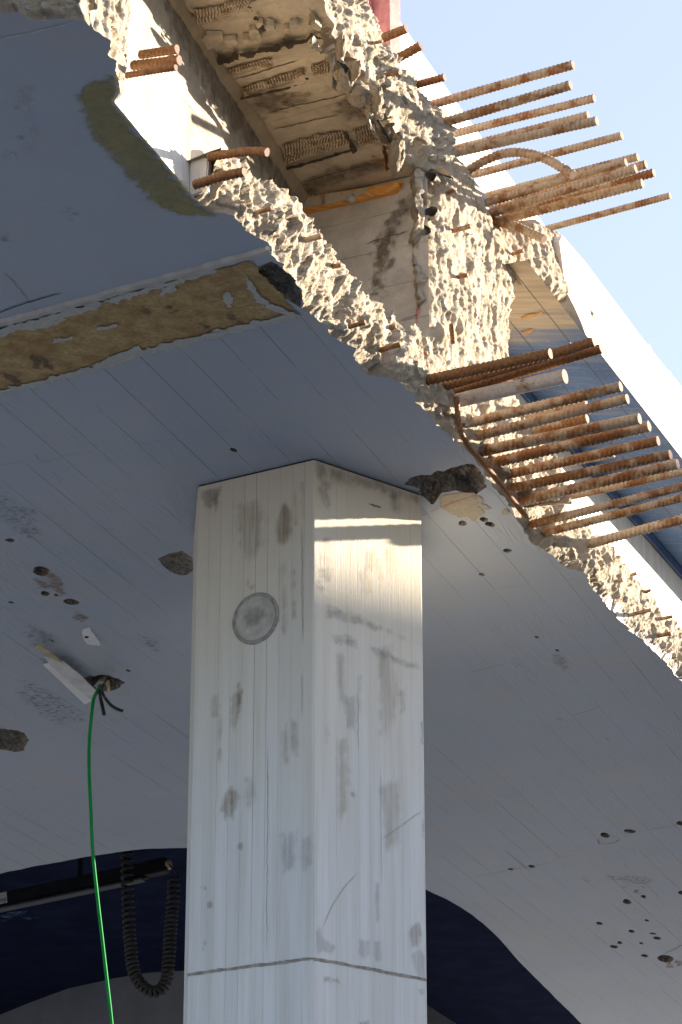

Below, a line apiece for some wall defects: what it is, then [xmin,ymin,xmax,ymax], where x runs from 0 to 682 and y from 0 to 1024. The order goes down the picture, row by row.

peeling [202,18,298,50]
leakage [78,78,212,216]
spalling [311,0,672,256]
spalling [0,147,682,680]
spalling [0,729,29,752]